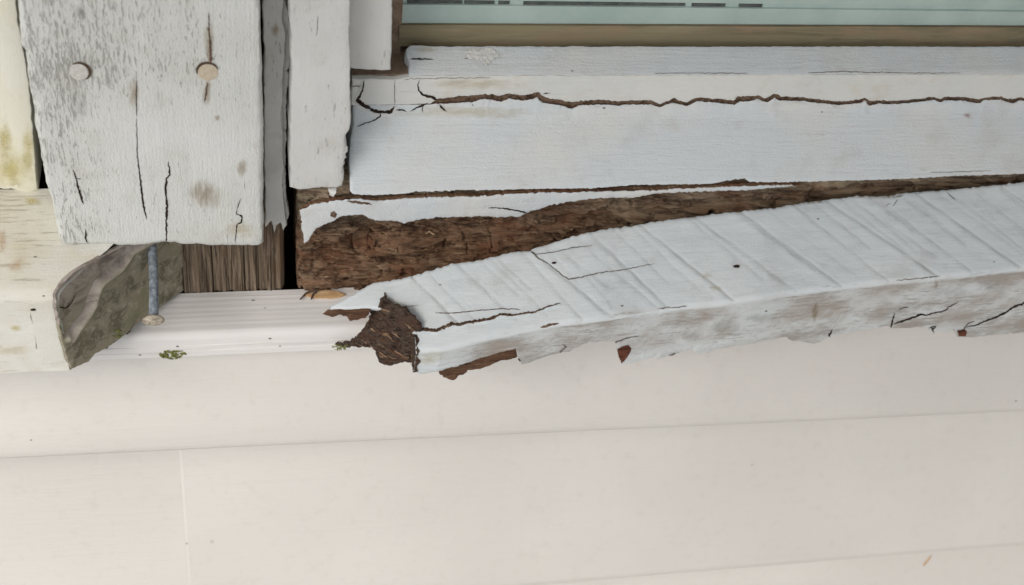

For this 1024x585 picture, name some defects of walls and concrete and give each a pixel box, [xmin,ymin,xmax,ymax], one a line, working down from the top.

crack [196,12,218,102]
crack [352,58,1024,127]
crack [136,80,171,241]
crack [73,171,84,204]
crack [531,245,652,280]
crack [407,303,567,353]
crack [890,302,1024,332]
spalling [411,333,421,373]
spalling [618,345,631,363]